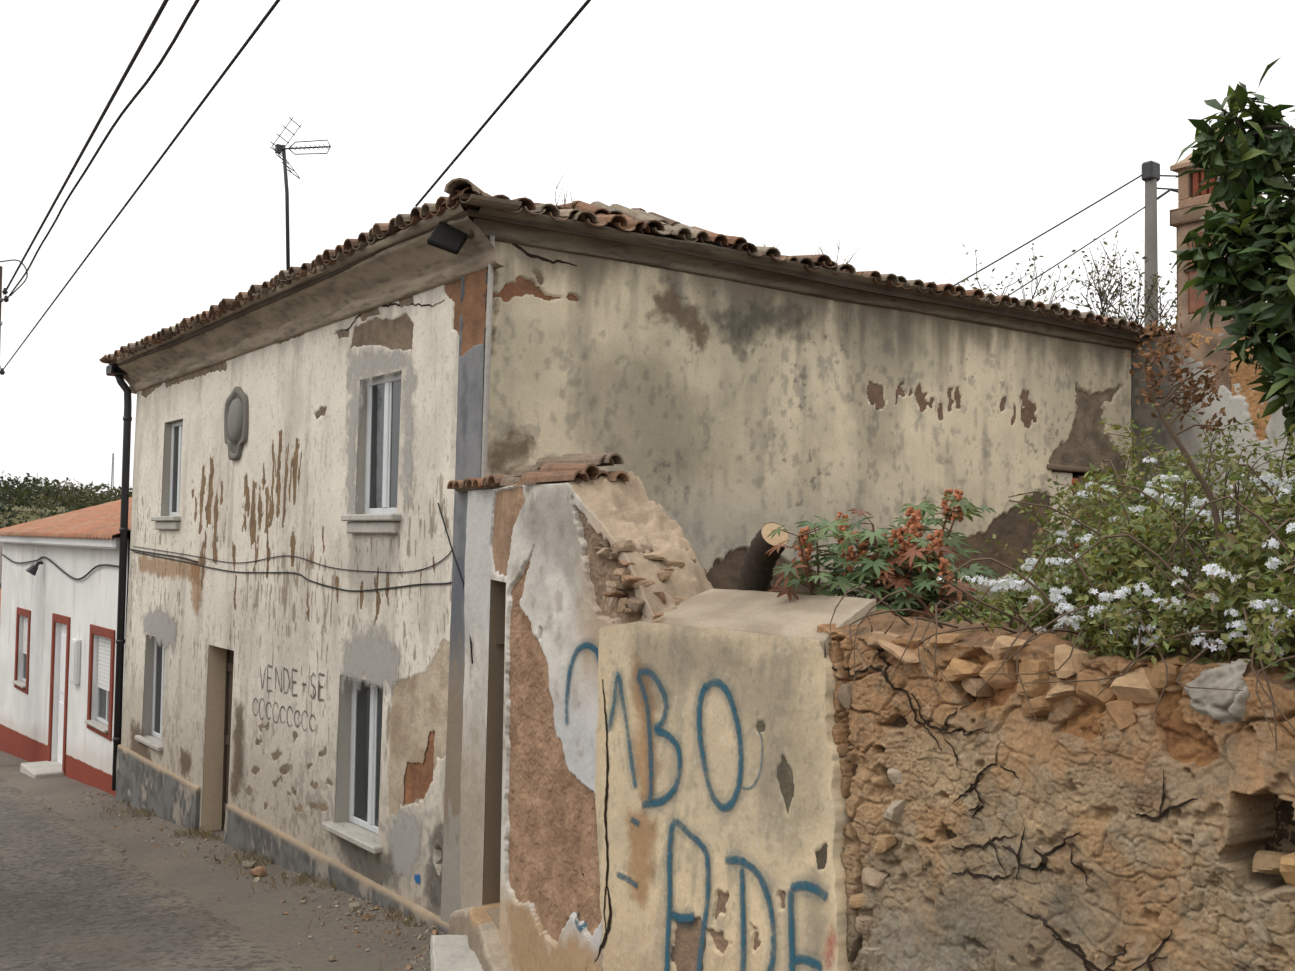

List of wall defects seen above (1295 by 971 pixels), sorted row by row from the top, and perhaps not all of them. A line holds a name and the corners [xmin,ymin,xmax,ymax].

crack [511,243,577,266]
flaking render [336,296,414,351]
crack [334,302,441,334]
spalling [445,268,578,362]
water stain [722,307,804,340]
spalling [1049,386,1127,515]
spalling [943,490,1051,584]
spalling [388,640,450,816]
spalling [492,483,602,942]
crack [832,614,1091,888]
crack [1136,770,1198,821]
crack [1026,914,1172,971]